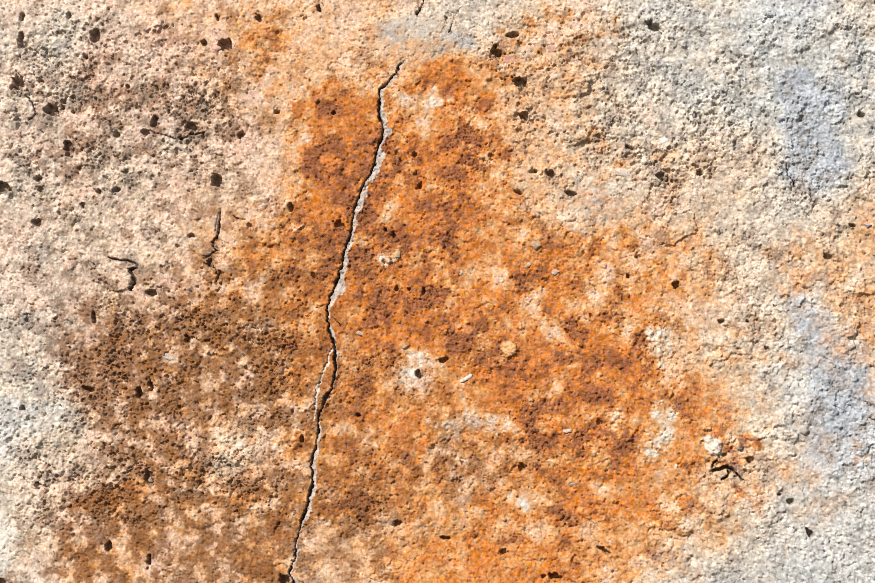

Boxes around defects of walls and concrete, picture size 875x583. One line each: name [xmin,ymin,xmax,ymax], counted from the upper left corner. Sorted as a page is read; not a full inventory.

corrosion [113,0,203,16]
corrosion [14,499,305,583]
corrosion [27,268,297,521]
crack [289,58,408,583]
corrosion [197,0,794,583]
corrosion [671,150,875,415]
corrosion [826,426,875,485]